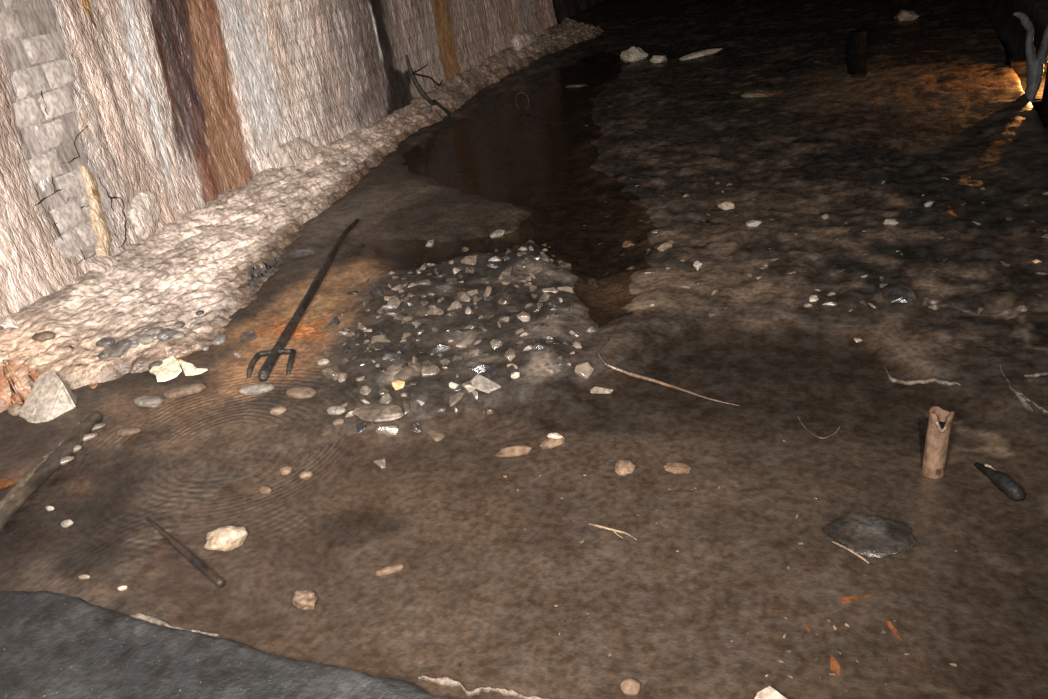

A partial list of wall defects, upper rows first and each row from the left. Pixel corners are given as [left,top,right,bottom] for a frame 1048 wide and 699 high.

corrosion [182,0,253,205]
corrosion [432,0,460,81]
crack [35,125,127,264]